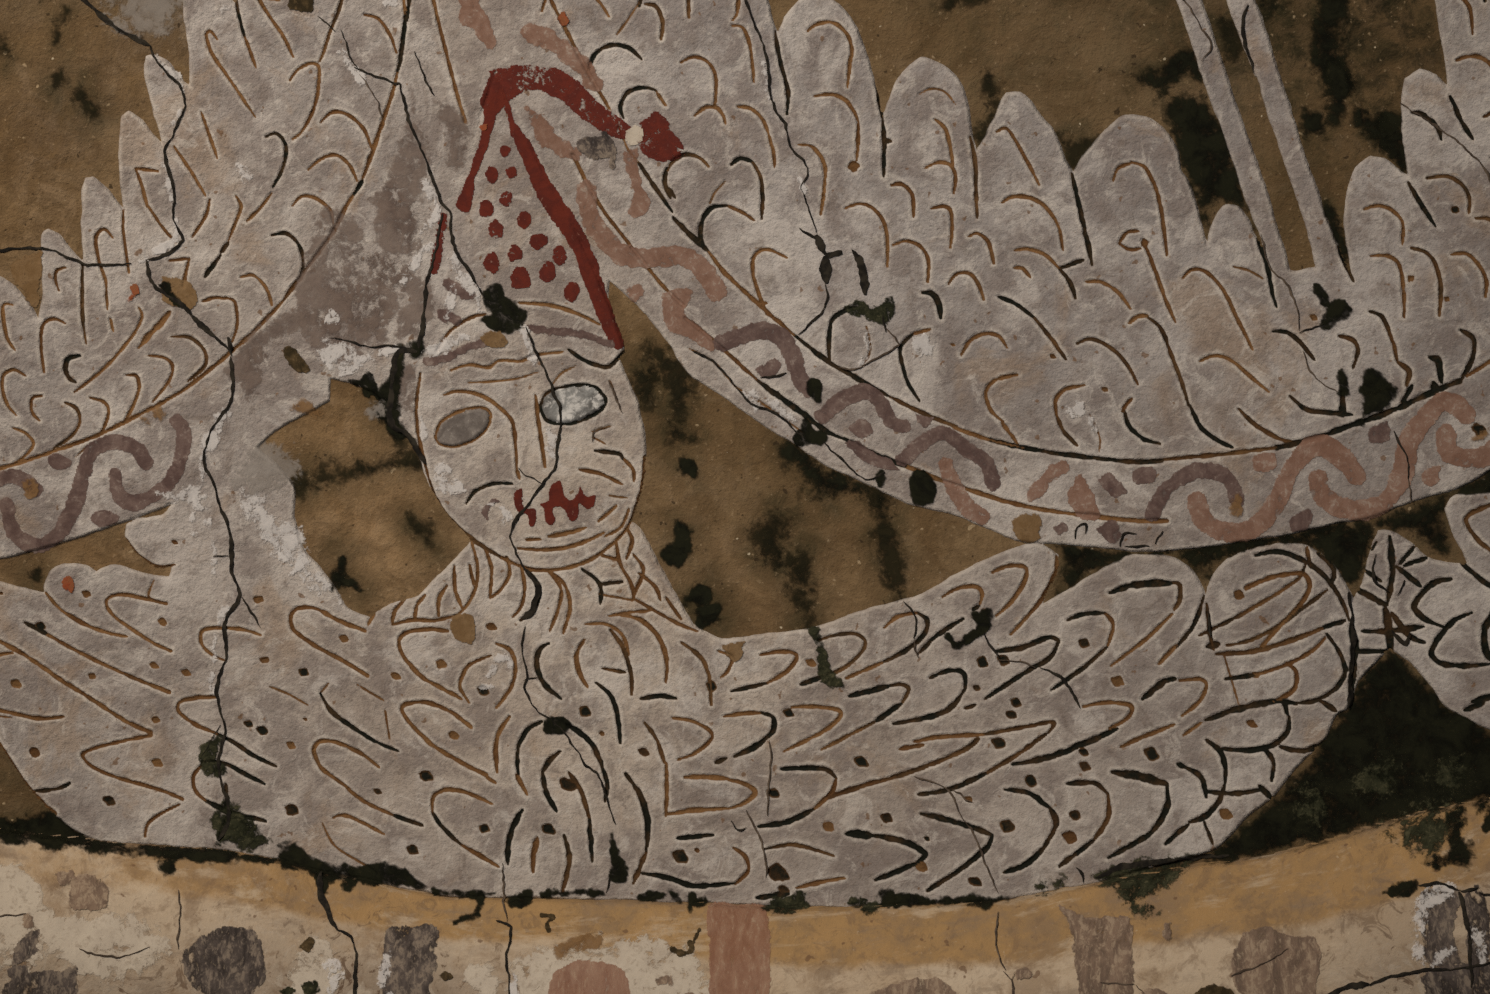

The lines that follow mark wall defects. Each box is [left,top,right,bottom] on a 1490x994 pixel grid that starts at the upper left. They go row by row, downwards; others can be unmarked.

damp [138,162,179,263]
crack [744,0,900,371]
damp [1056,132,1095,168]
crack [0,0,260,840]
damp [631,341,697,443]
damp [742,389,797,421]
crack [509,327,622,824]
peeling [0,862,173,984]
peeling [280,936,341,994]
peeling [440,913,710,994]
spalling [1195,983,1234,994]
crack [1328,881,1490,994]